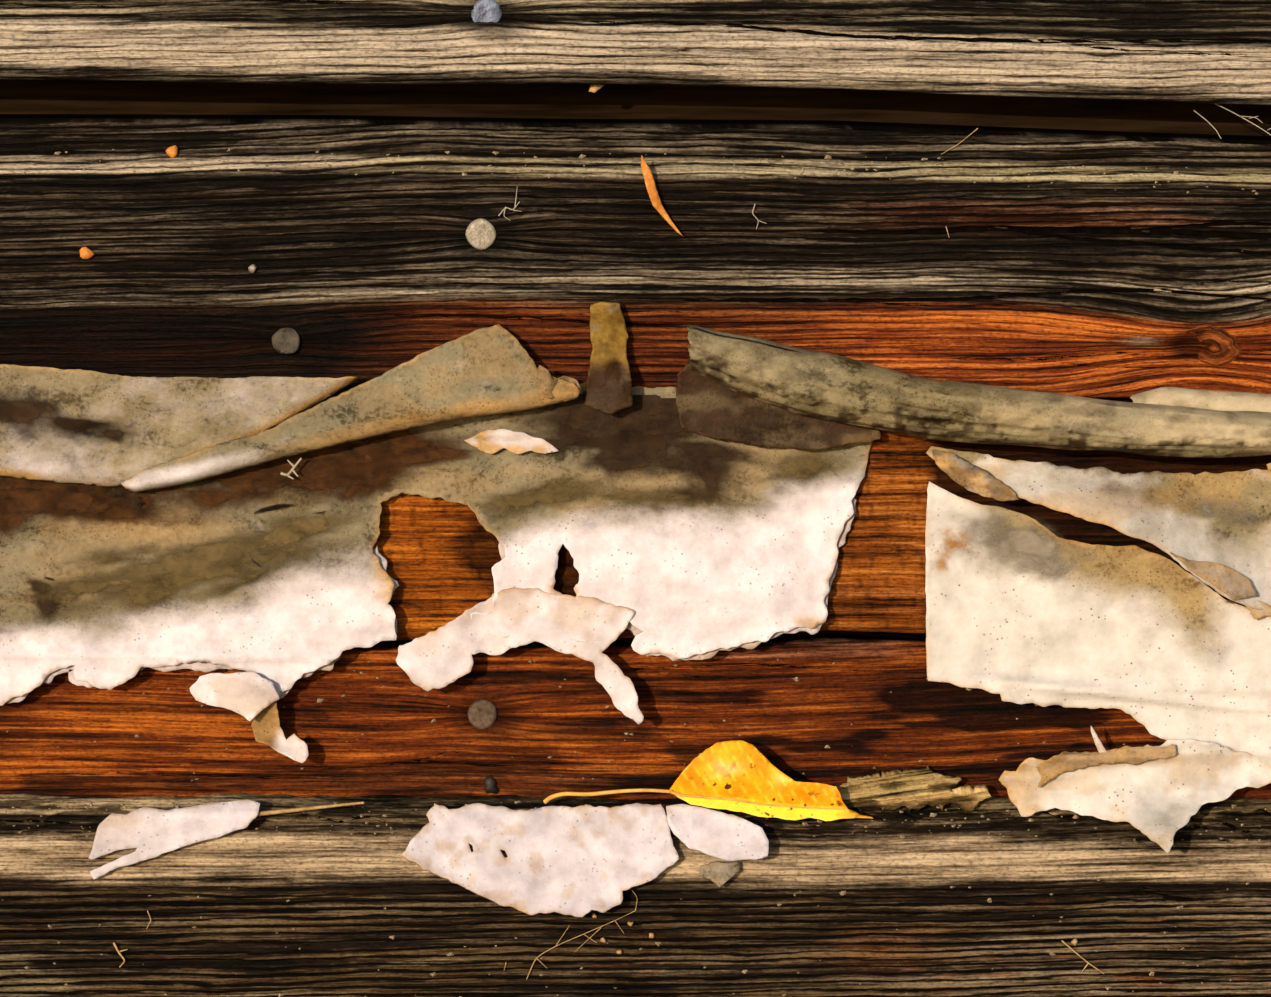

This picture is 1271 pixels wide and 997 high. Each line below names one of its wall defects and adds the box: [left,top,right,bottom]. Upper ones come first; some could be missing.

water stain [0,397,125,442]
water stain [0,429,470,531]
water stain [27,514,349,619]